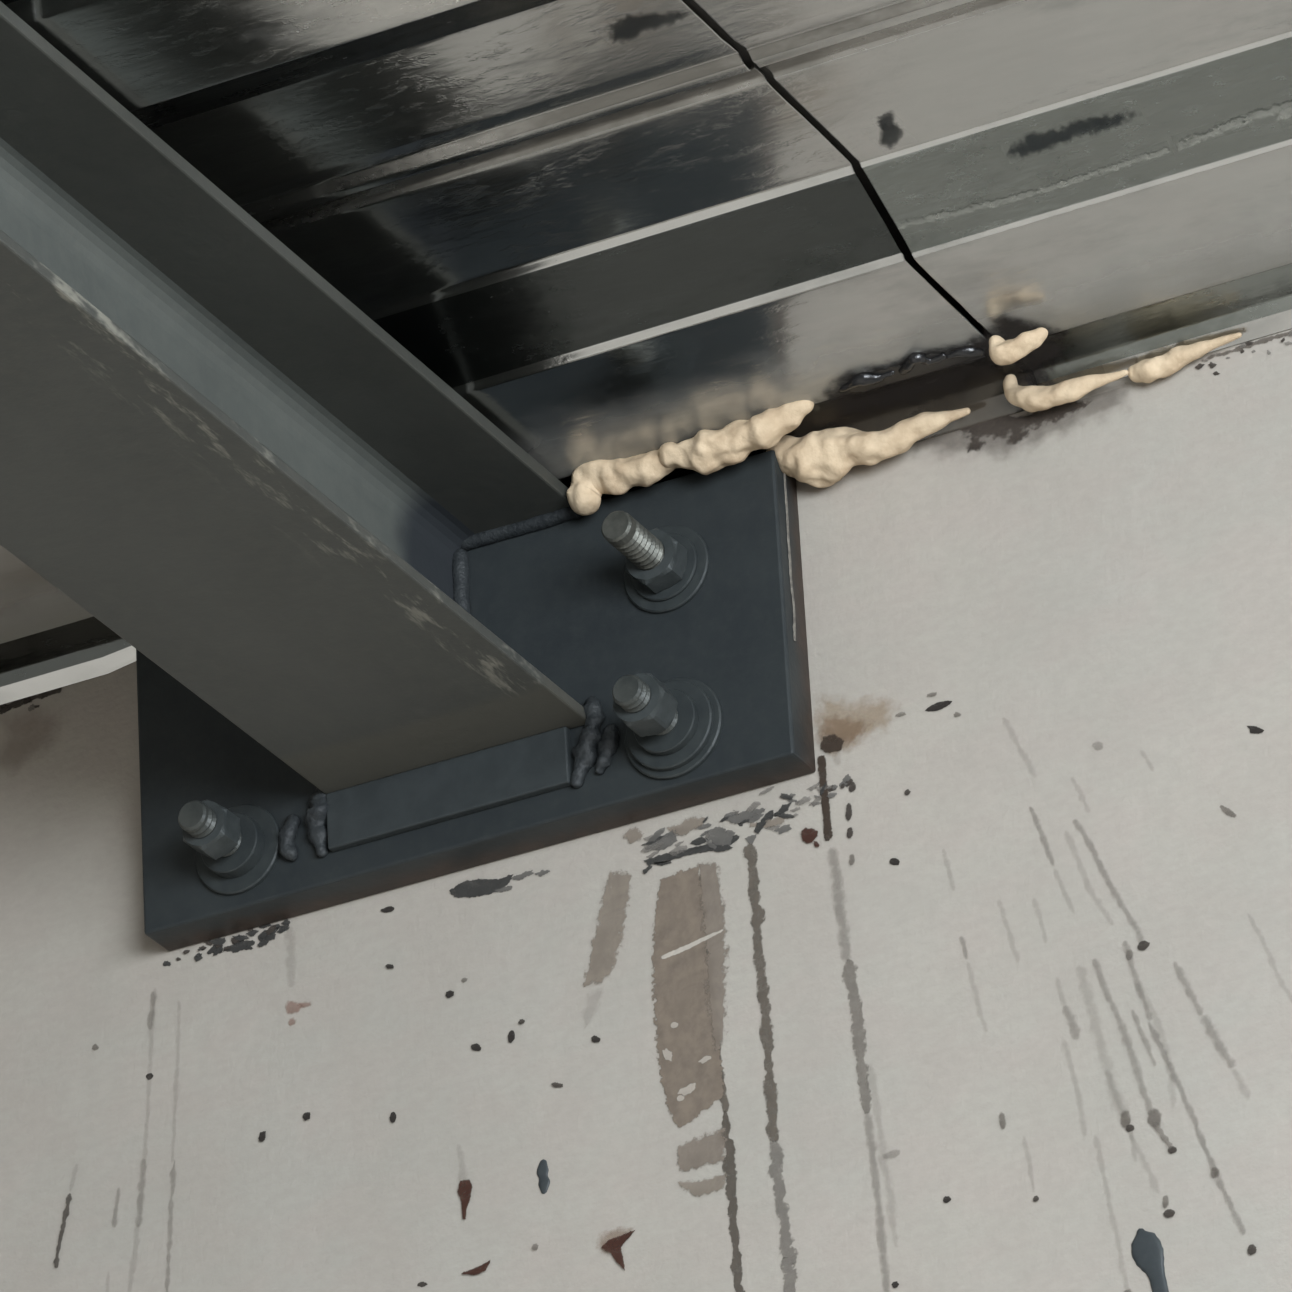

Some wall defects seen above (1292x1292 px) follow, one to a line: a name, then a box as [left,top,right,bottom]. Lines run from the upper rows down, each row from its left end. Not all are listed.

rust [821,734,844,753]
peeling [623,774,853,874]
leakage [583,872,632,987]
leakage [1126,940,1150,959]
leakage [651,863,745,1292]
leakage [743,844,797,1292]
leakage [842,959,871,1113]
leakage [1121,1109,1177,1154]
leakage [1163,1196,1175,1218]